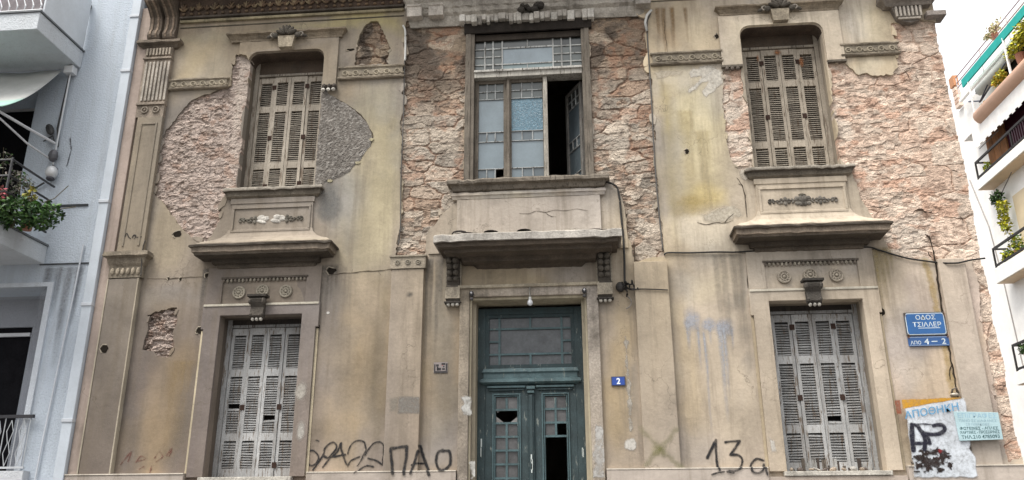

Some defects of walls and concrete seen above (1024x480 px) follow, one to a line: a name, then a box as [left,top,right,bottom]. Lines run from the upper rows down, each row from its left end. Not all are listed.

peeling [144,309,178,358]
peeling [154,56,254,242]
peeling [315,90,374,185]
peeling [346,21,466,255]
peeling [589,13,753,262]
peeling [828,21,1022,462]